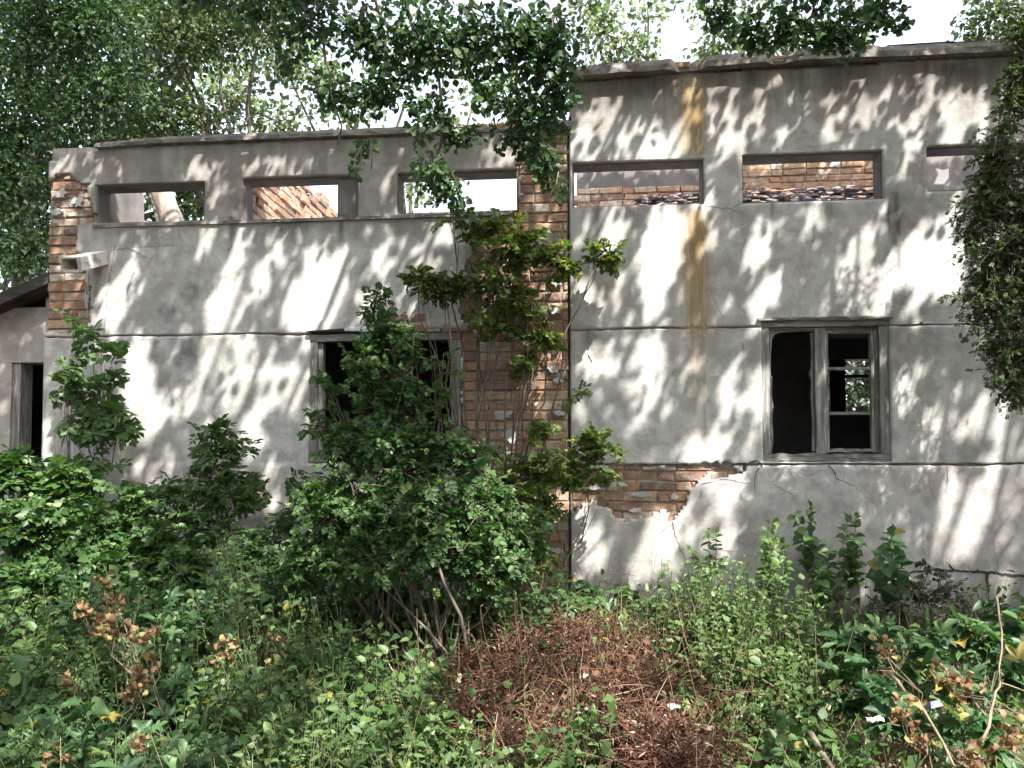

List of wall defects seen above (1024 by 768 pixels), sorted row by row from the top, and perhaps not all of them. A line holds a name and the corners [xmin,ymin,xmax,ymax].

rust [685,81,703,151]
flaking render [46,173,162,338]
rust [686,211,707,334]
flaking render [460,135,752,612]
peeling [714,518,762,552]
crack [732,460,763,494]